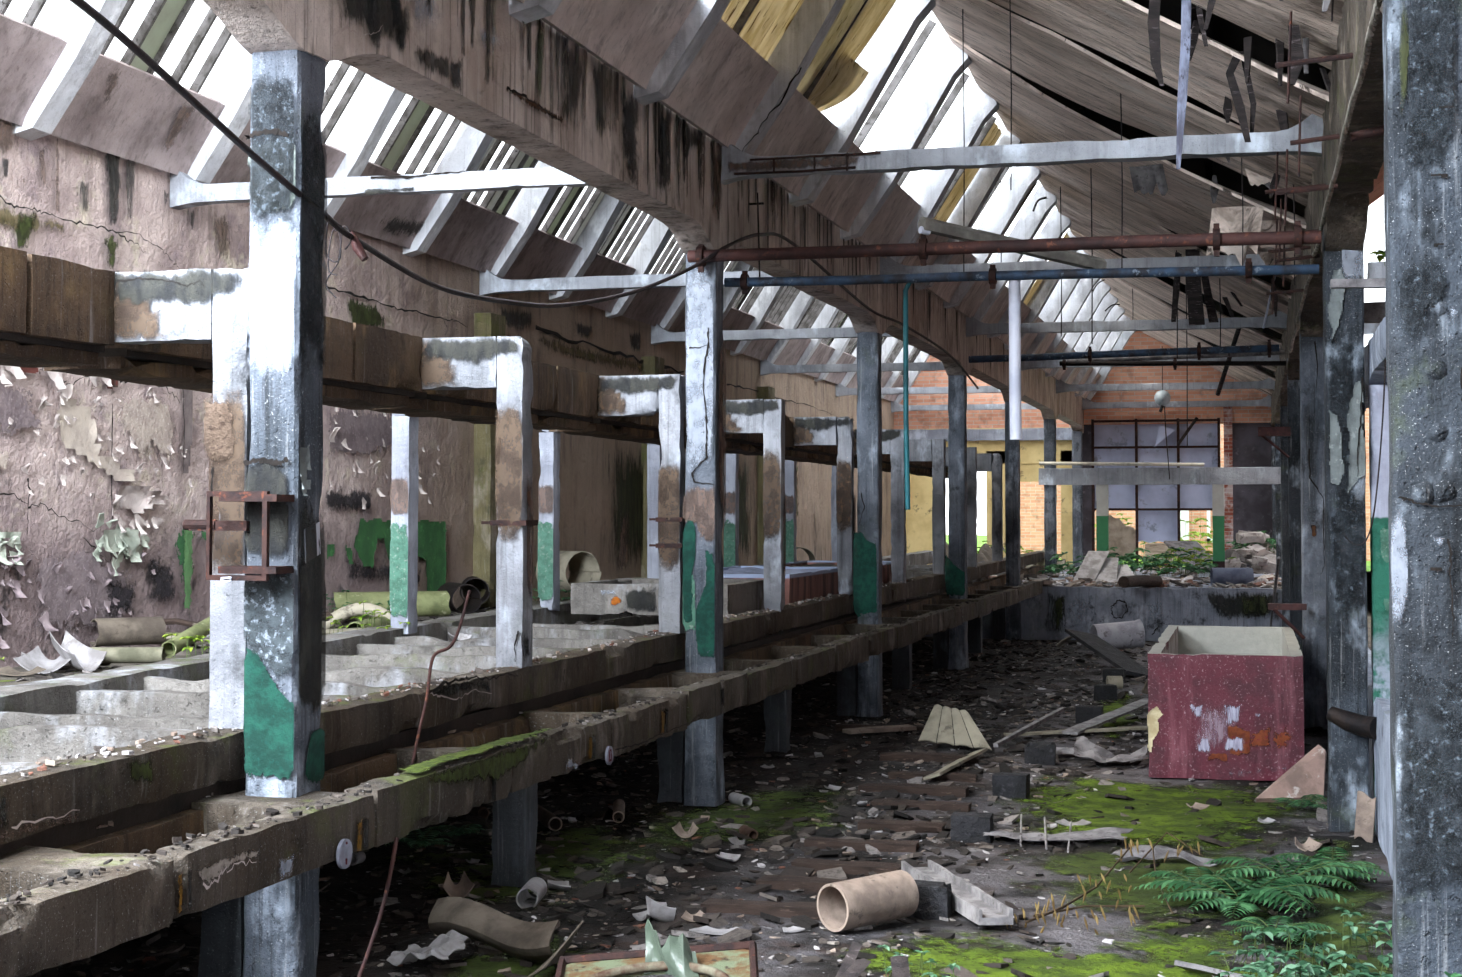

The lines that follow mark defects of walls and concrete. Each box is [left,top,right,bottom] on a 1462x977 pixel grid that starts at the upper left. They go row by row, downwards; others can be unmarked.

damp [340,0,496,90]
damp [0,120,16,177]
damp [39,139,60,211]
damp [80,181,89,211]
crack [0,194,204,287]
damp [106,153,135,225]
damp [522,19,878,294]
peeling [0,365,392,649]